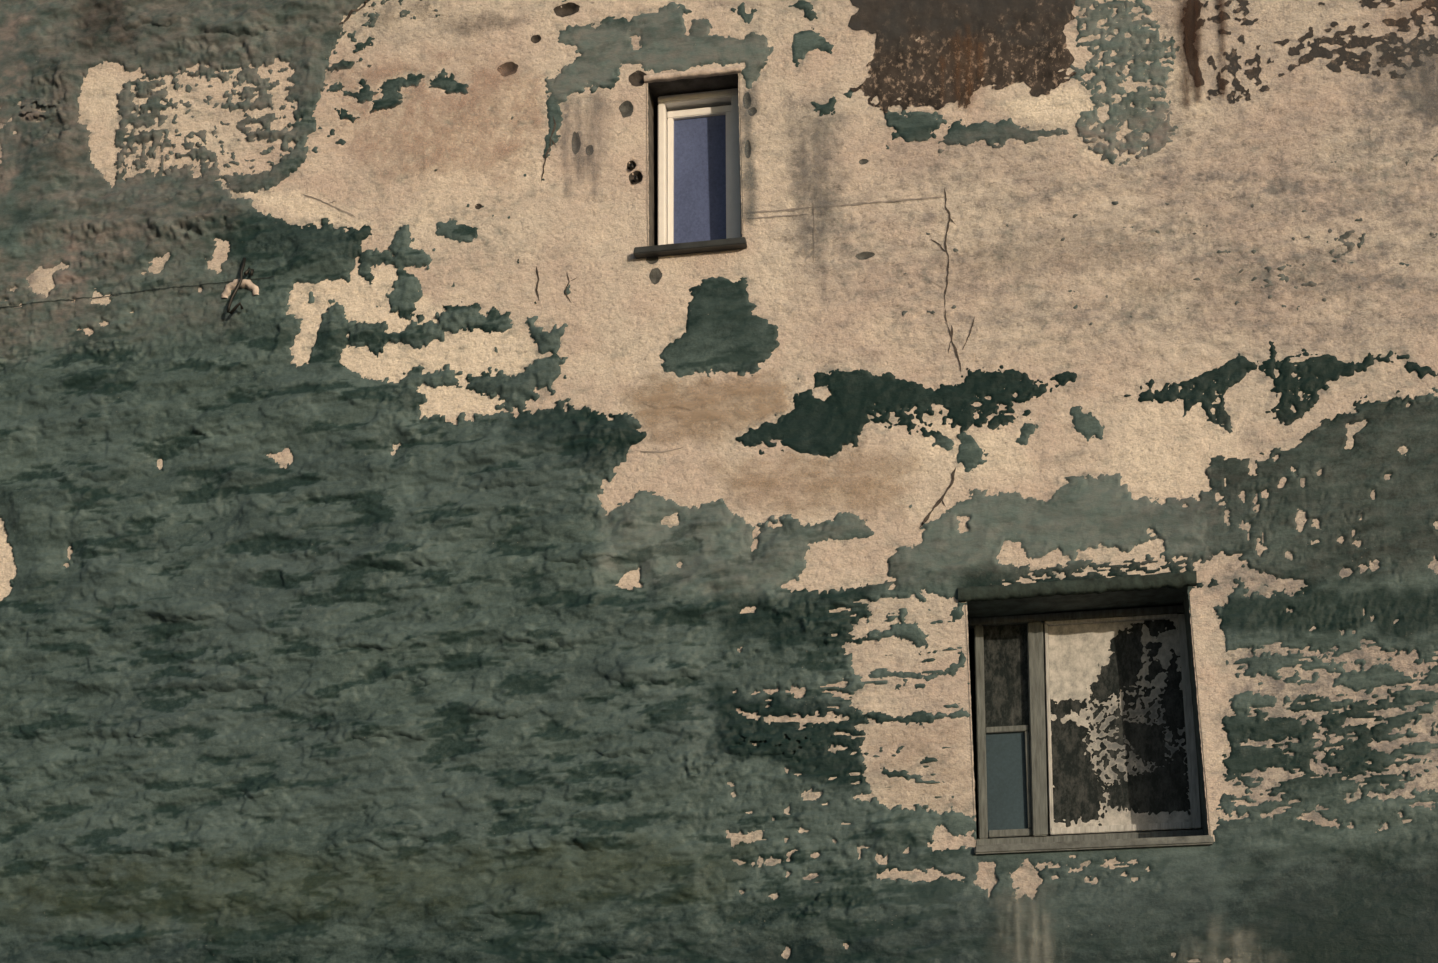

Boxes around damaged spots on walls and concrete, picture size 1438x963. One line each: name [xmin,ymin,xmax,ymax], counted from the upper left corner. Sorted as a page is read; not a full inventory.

corrosion [1183,3,1200,104]
peeling [0,101,46,164]
peeling [72,0,1438,594]
crack [747,188,975,372]
peeling [0,518,17,601]
peeling [736,681,849,730]
peeling [820,589,976,821]
peeling [996,528,1438,846]
peeling [726,806,820,883]
peeling [801,788,828,805]
peeling [927,825,976,851]
peeling [857,846,1150,900]